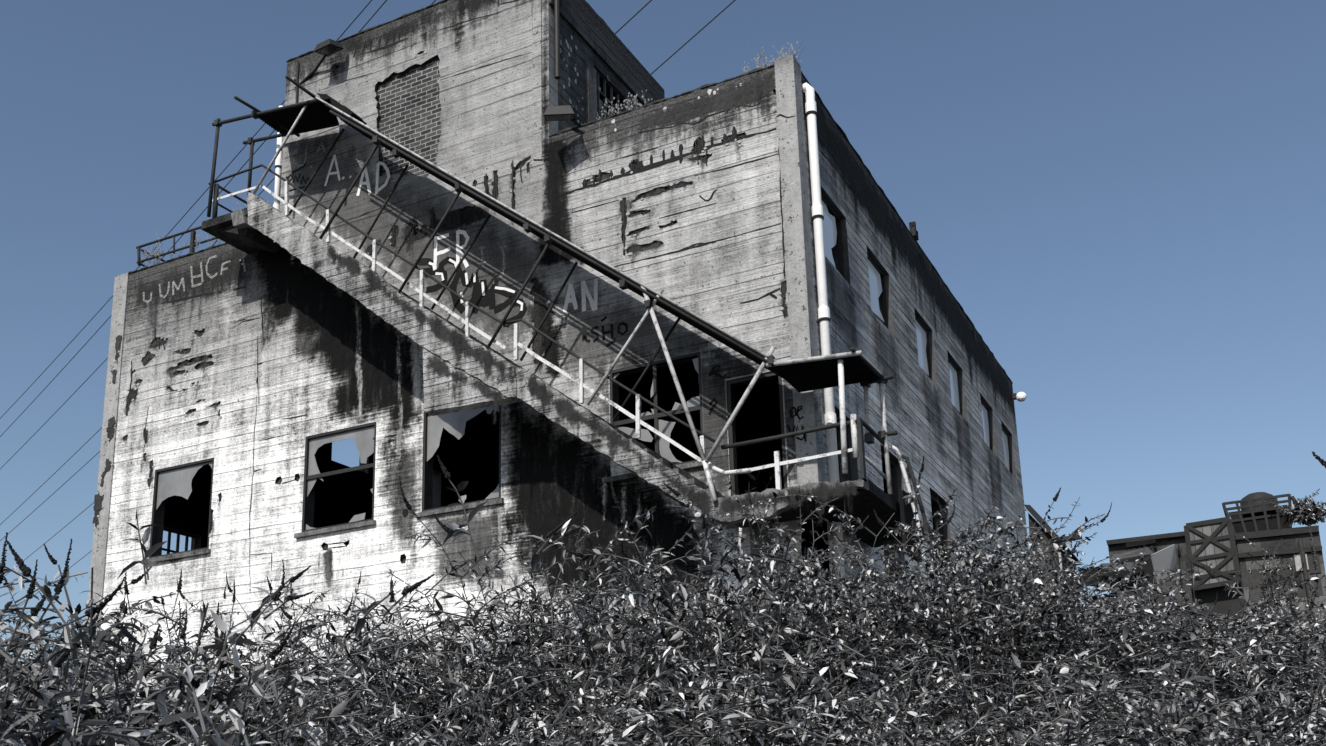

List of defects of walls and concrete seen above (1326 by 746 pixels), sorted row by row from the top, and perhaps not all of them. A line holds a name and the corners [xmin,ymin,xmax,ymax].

spalling [105,327,222,489]
spalling [92,459,114,528]